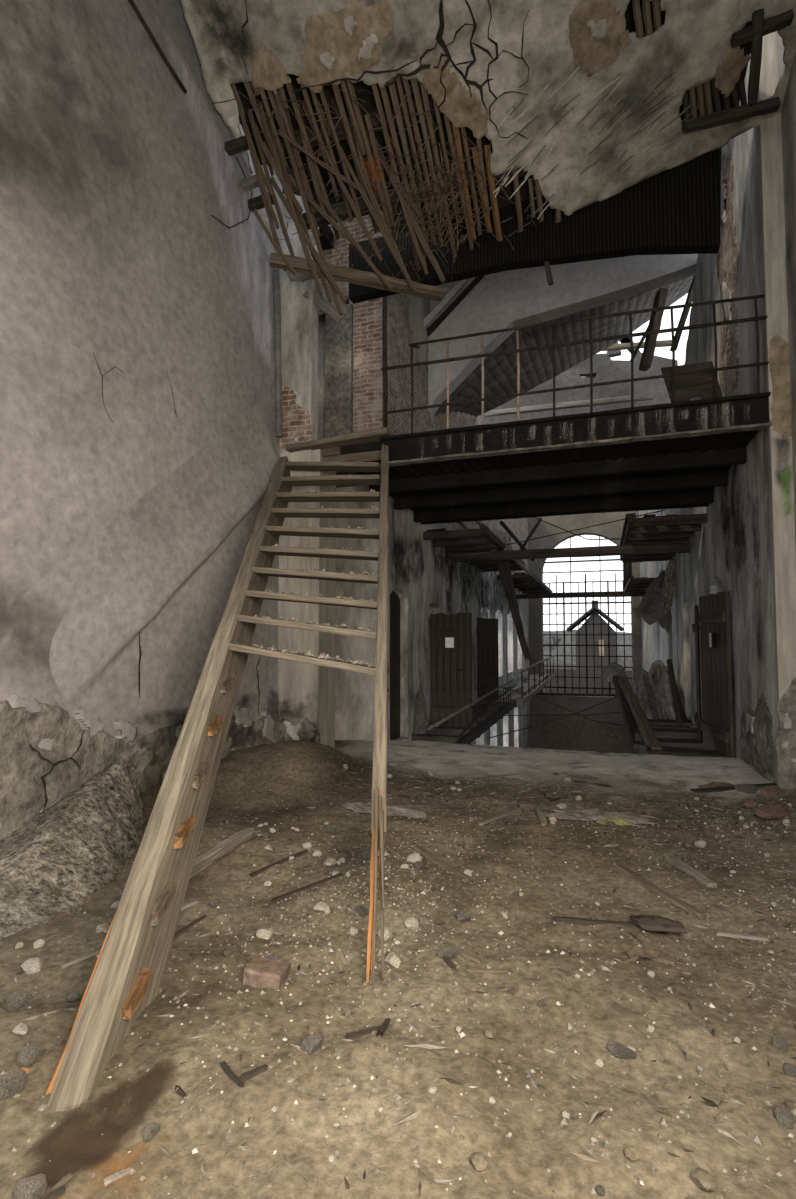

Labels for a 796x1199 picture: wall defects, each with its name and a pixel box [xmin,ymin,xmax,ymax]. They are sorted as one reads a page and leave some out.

flaking render [248,0,393,95]
crack [291,0,529,139]
flaking render [423,59,491,139]
flaking render [569,0,629,77]
flaking render [715,46,751,98]
water stain [721,465,759,569]
water stain [392,539,515,618]
flaking render [0,694,182,841]
flaking render [221,704,321,759]
flaking render [739,678,796,790]